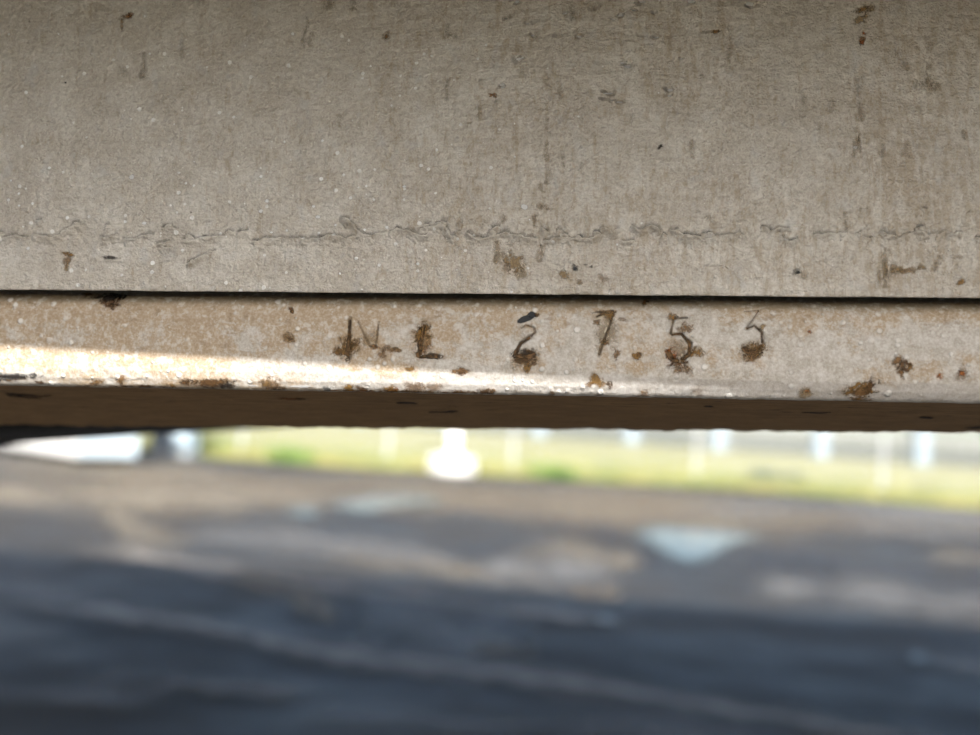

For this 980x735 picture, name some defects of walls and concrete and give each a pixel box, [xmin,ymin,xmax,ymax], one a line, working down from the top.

crack [0,215,804,272]
crack [876,206,980,248]
rust [892,355,913,380]
rust [843,377,881,401]